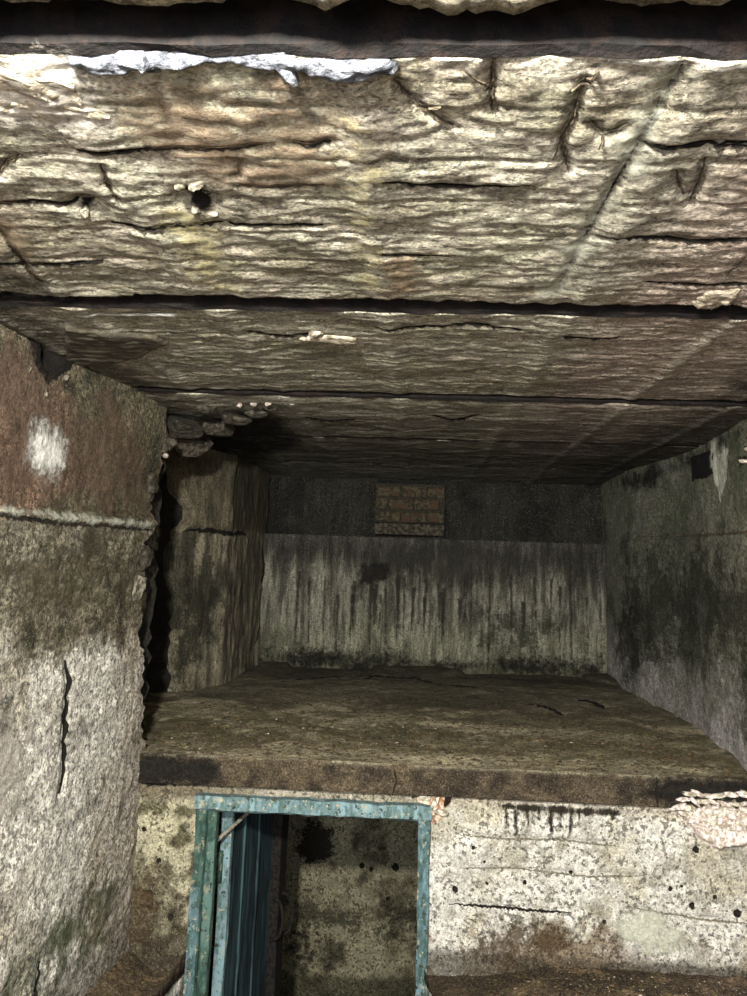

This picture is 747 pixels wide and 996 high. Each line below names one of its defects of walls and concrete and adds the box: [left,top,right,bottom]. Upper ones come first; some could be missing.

crack [0,196,80,207]
crack [71,142,325,233]
crack [292,137,331,149]
crack [383,181,529,190]
crack [552,61,747,290]
damp [0,498,157,663]
damp [273,538,605,676]
damp [616,536,747,686]
crack [58,660,72,794]
damp [502,803,621,841]
damp [647,778,747,804]
spalling [668,789,747,853]